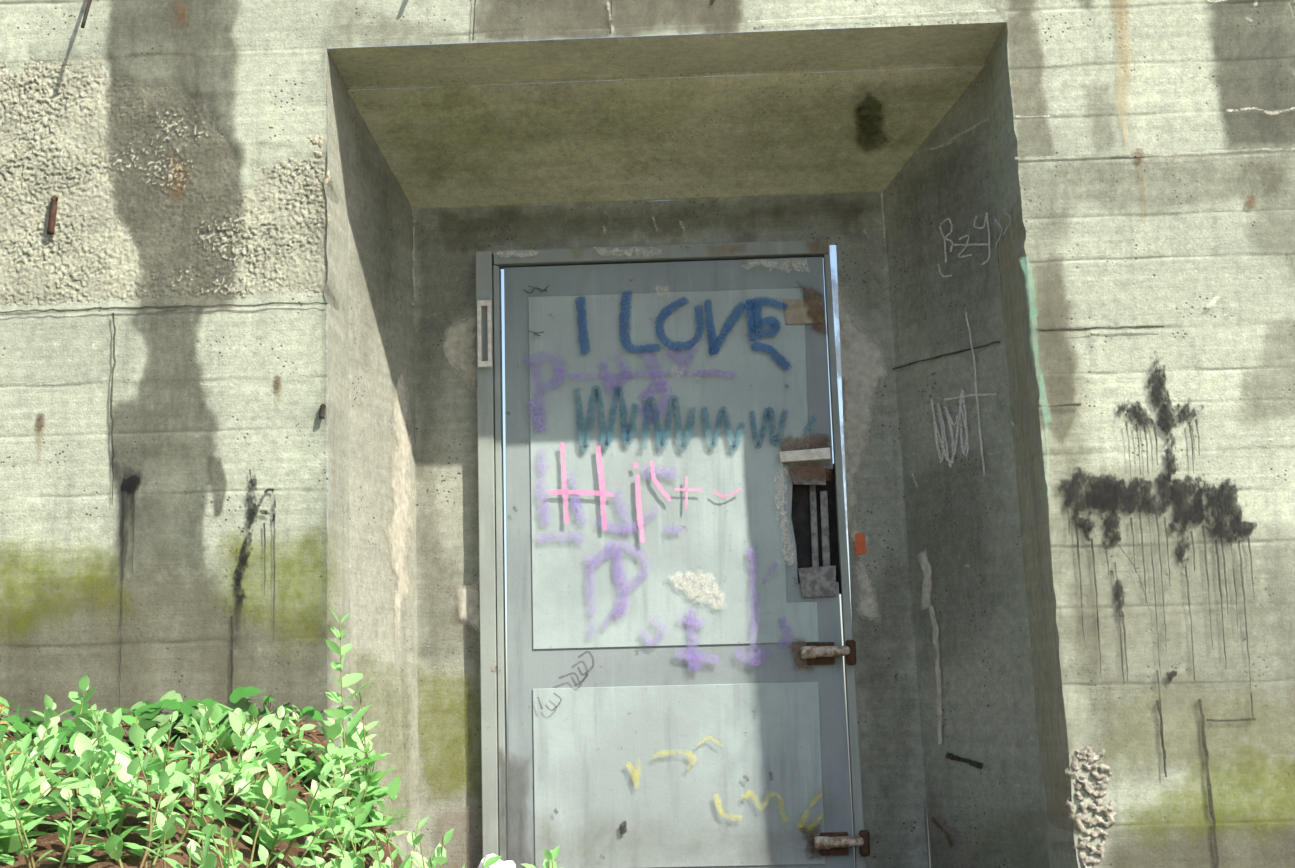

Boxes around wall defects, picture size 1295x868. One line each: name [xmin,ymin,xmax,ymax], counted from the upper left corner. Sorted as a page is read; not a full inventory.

water stain [476,0,741,37]
water stain [1209,0,1295,151]
water stain [0,0,326,730]
water stain [1066,419,1295,772]
spalling [1065,745,1118,868]
crack [1156,700,1167,777]
crack [1198,693,1256,868]